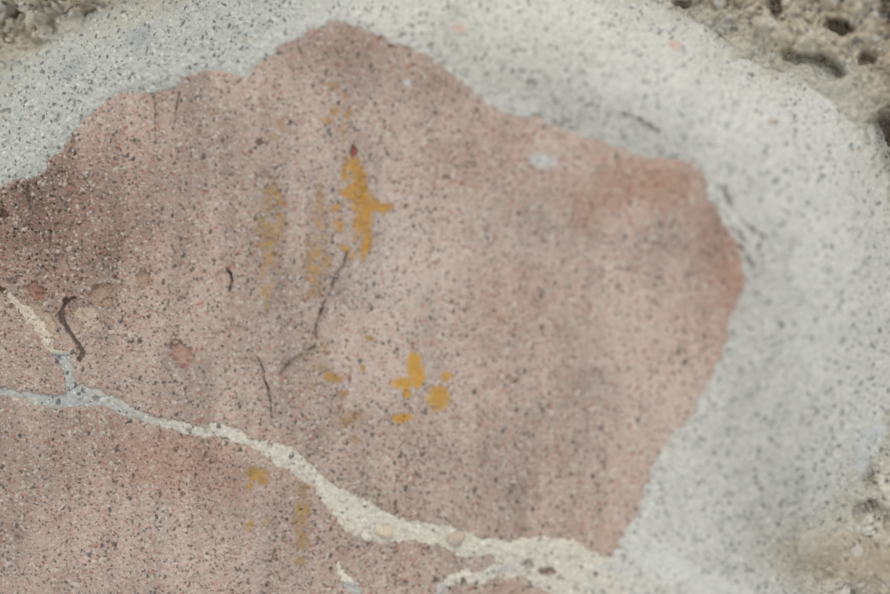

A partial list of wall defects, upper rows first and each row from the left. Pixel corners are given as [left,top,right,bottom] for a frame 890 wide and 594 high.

spalling [0,0,125,71]
spalling [659,0,890,156]
crack [0,249,634,594]
spalling [820,411,890,544]